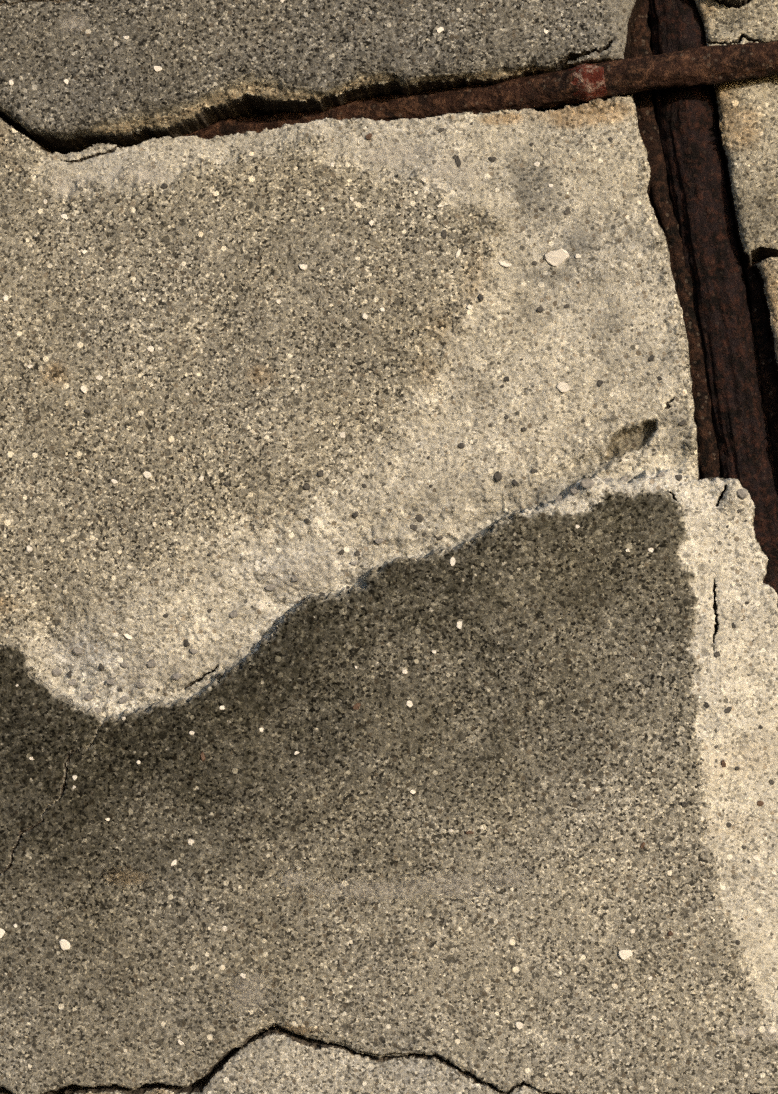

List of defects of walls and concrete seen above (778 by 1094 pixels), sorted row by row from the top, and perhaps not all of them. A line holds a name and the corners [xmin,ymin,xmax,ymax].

crack [0,40,627,163]
leakage [0,494,684,861]
crack [0,1086,13,1094]
crack [41,1025,560,1094]